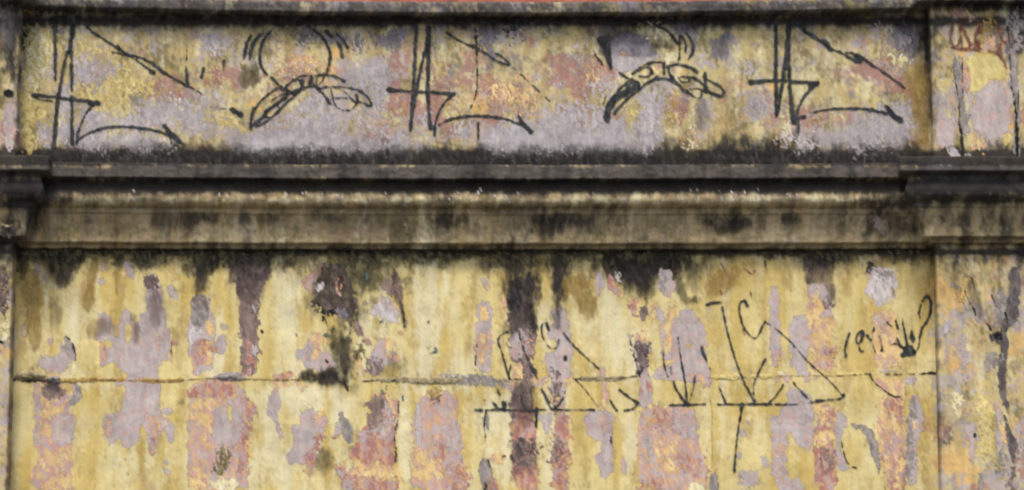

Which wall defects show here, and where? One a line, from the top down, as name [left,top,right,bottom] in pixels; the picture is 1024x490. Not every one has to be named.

leakage [38,63,935,165]
leakage [182,212,211,229]
leakage [536,212,585,236]
leakage [758,249,933,298]
leakage [16,249,743,348]
crack [13,376,46,384]
crack [242,376,300,384]
leakage [330,327,351,373]
peeling [94,254,926,490]
crack [576,354,641,380]
peeling [30,337,83,490]
peeling [941,330,1024,490]